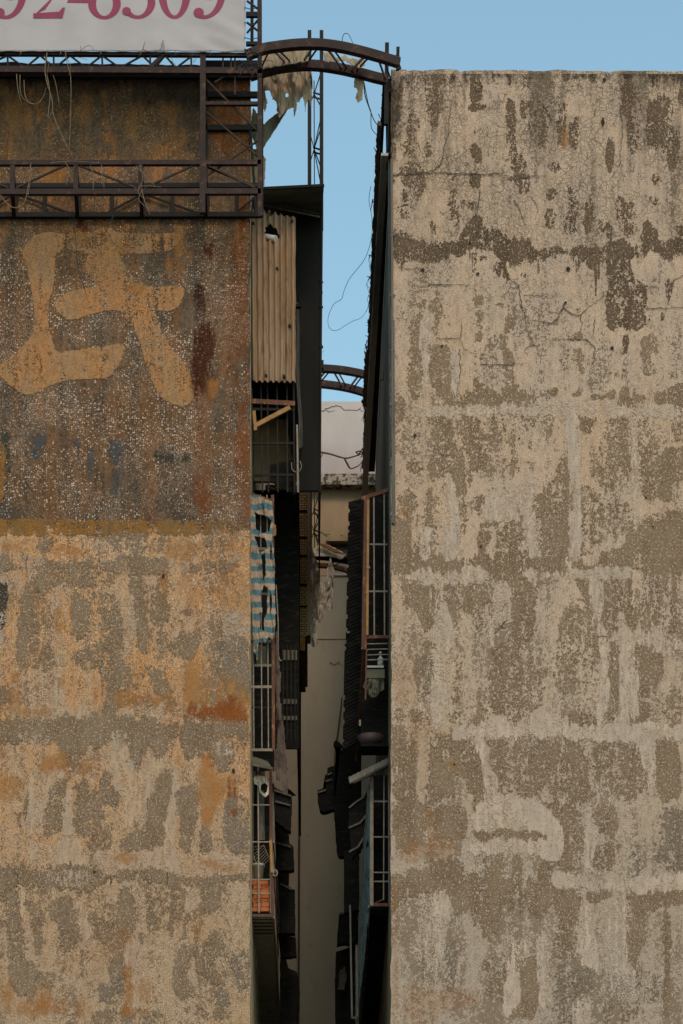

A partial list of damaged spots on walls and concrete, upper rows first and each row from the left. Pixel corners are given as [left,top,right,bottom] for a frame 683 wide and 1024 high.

crack [393,101,548,226]
corrosion [191,280,218,400]
crack [437,279,603,394]
corrosion [169,661,250,722]